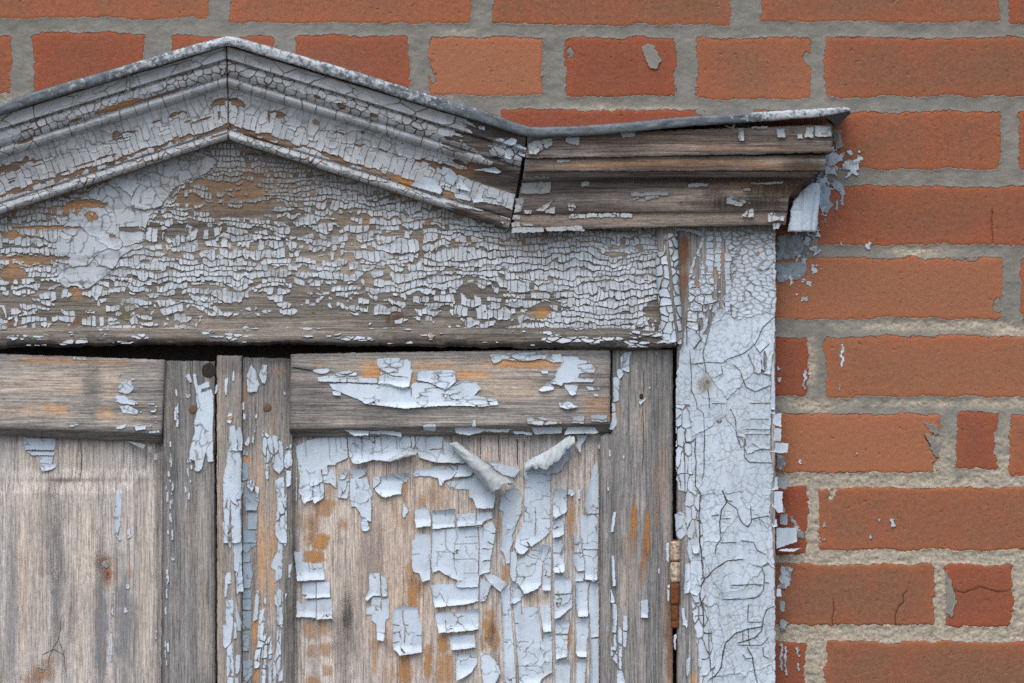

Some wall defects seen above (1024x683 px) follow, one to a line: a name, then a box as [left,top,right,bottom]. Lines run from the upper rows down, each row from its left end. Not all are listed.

peeling [738,126,832,141]
peeling [0,47,801,683]
crack [675,318,771,681]